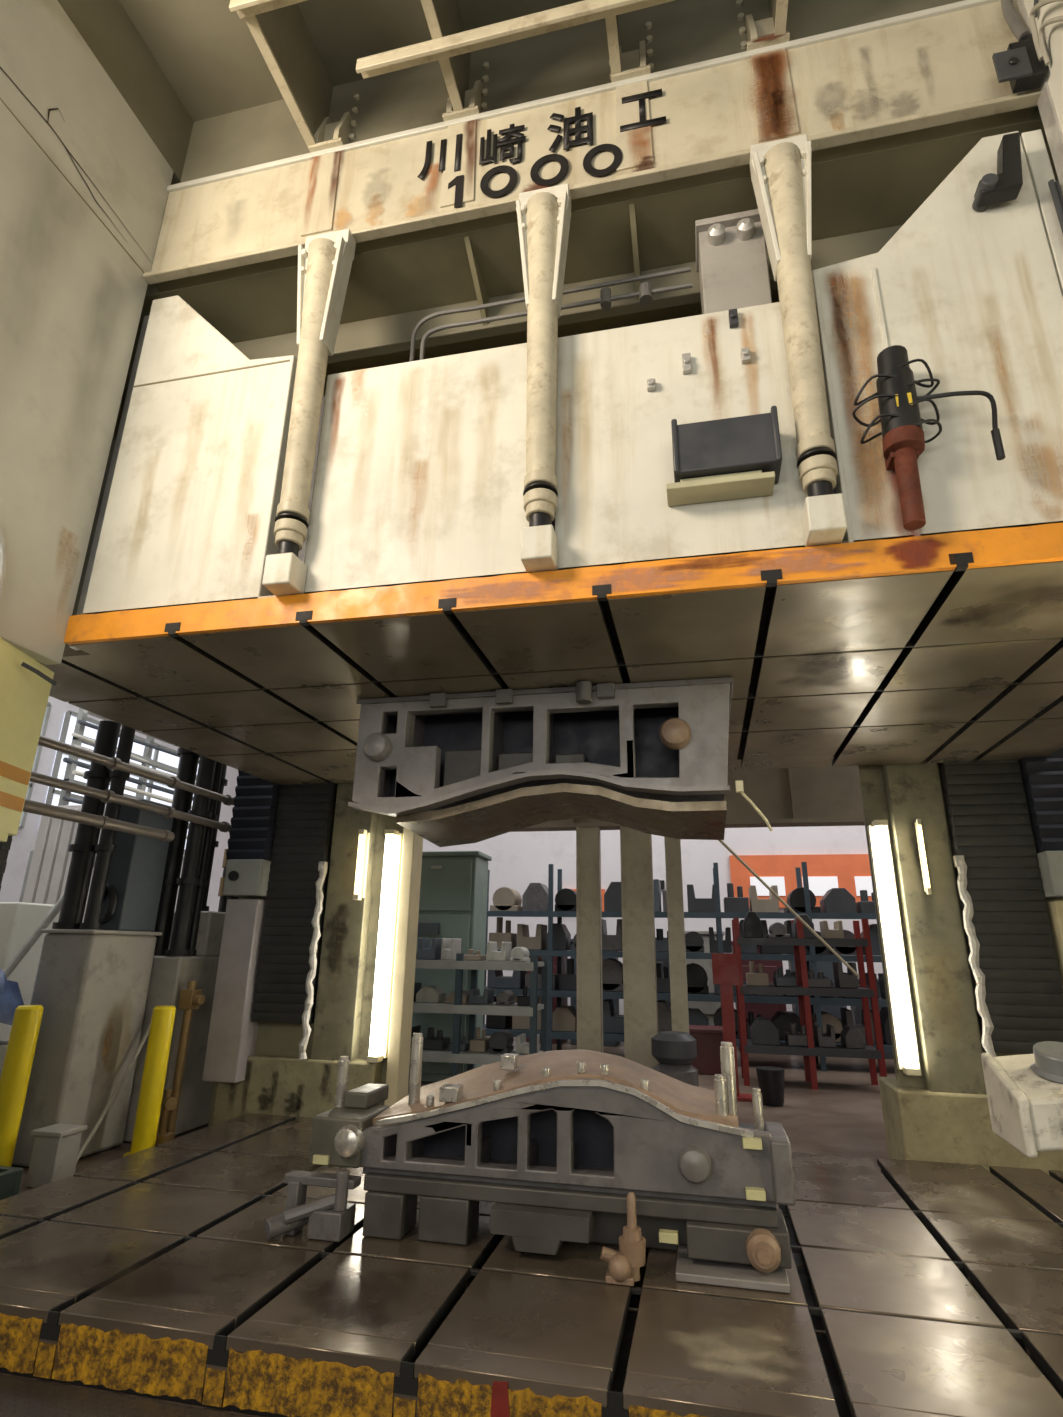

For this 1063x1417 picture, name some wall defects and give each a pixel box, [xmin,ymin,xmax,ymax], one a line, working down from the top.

rust [753,33,790,139]
rust [830,276,876,432]
rust [871,451,942,568]